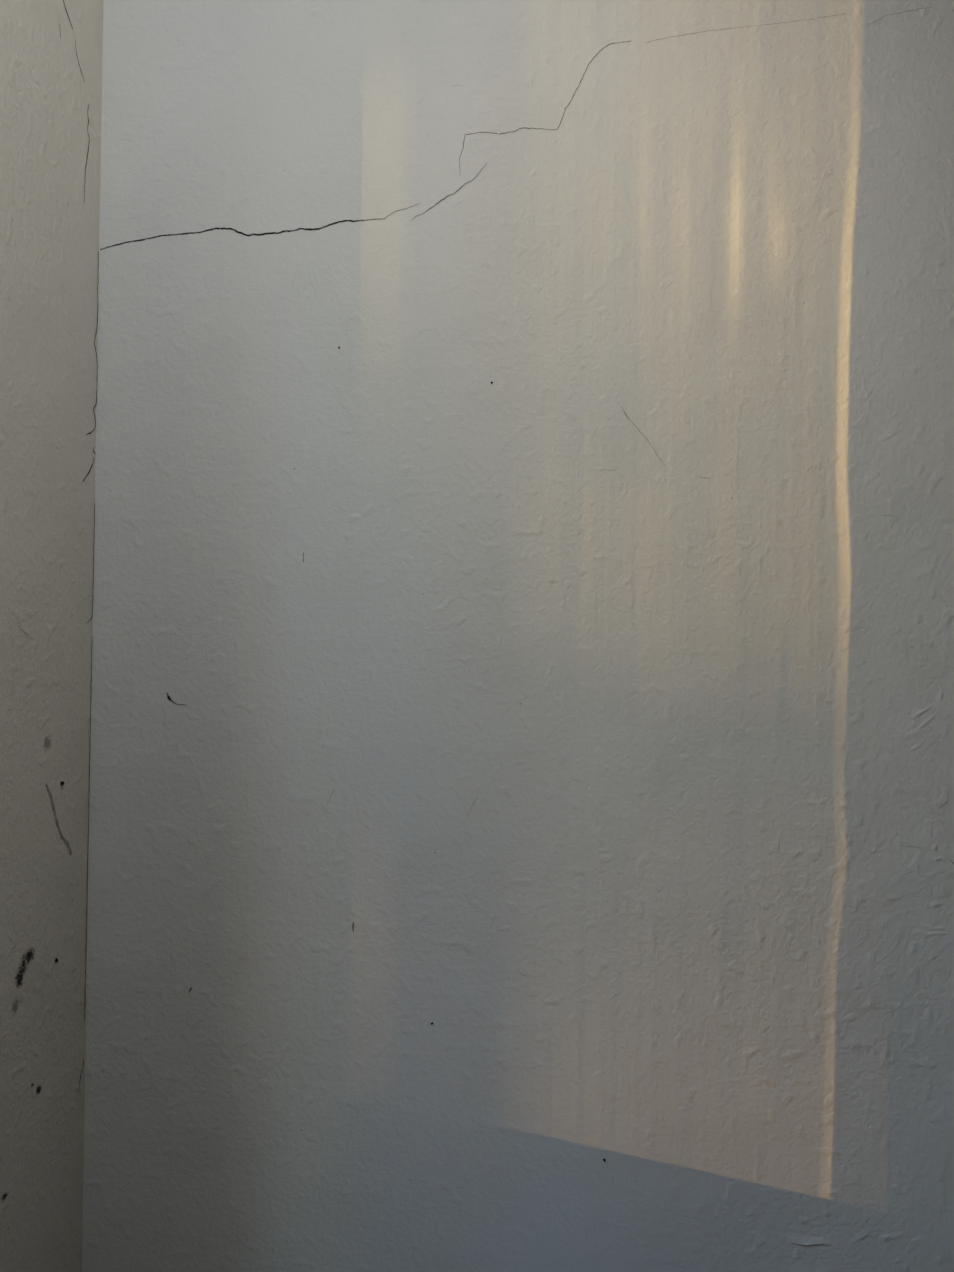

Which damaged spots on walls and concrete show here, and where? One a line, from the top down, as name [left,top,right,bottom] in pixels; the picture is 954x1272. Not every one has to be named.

crack [83,41,629,622]